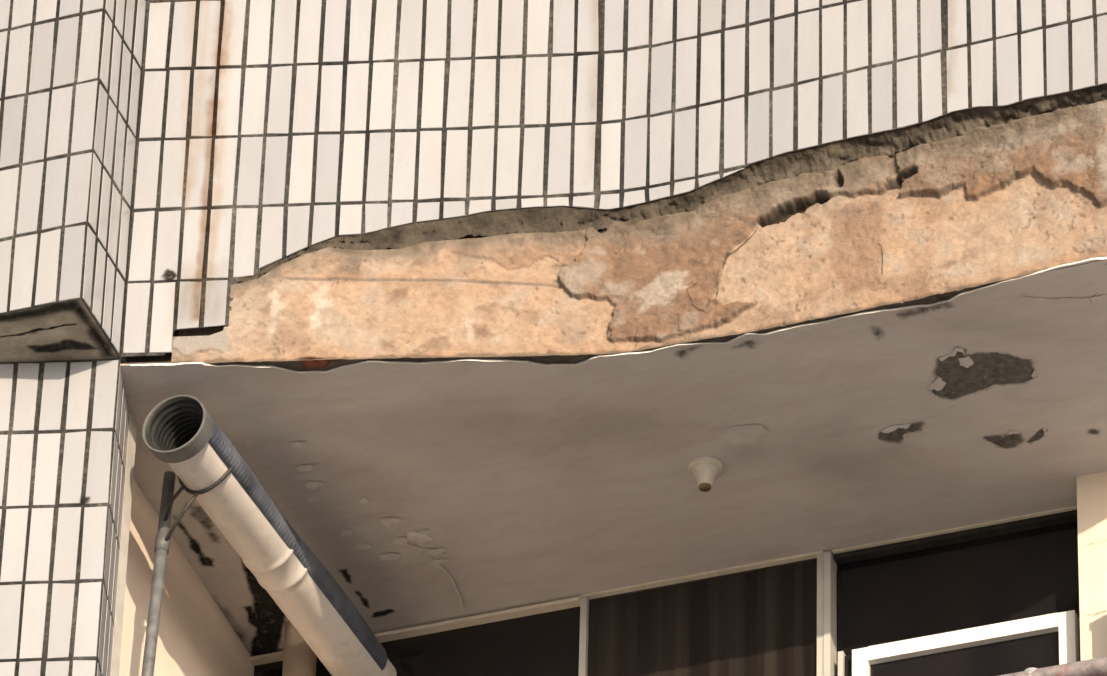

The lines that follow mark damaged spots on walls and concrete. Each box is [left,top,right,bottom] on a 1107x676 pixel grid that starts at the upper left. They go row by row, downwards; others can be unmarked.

spalling [130,84,1107,373]
crack [0,324,77,338]
spalling [0,301,114,357]
peeling [927,347,1037,400]
peeling [879,423,922,444]
peeling [984,428,1047,449]